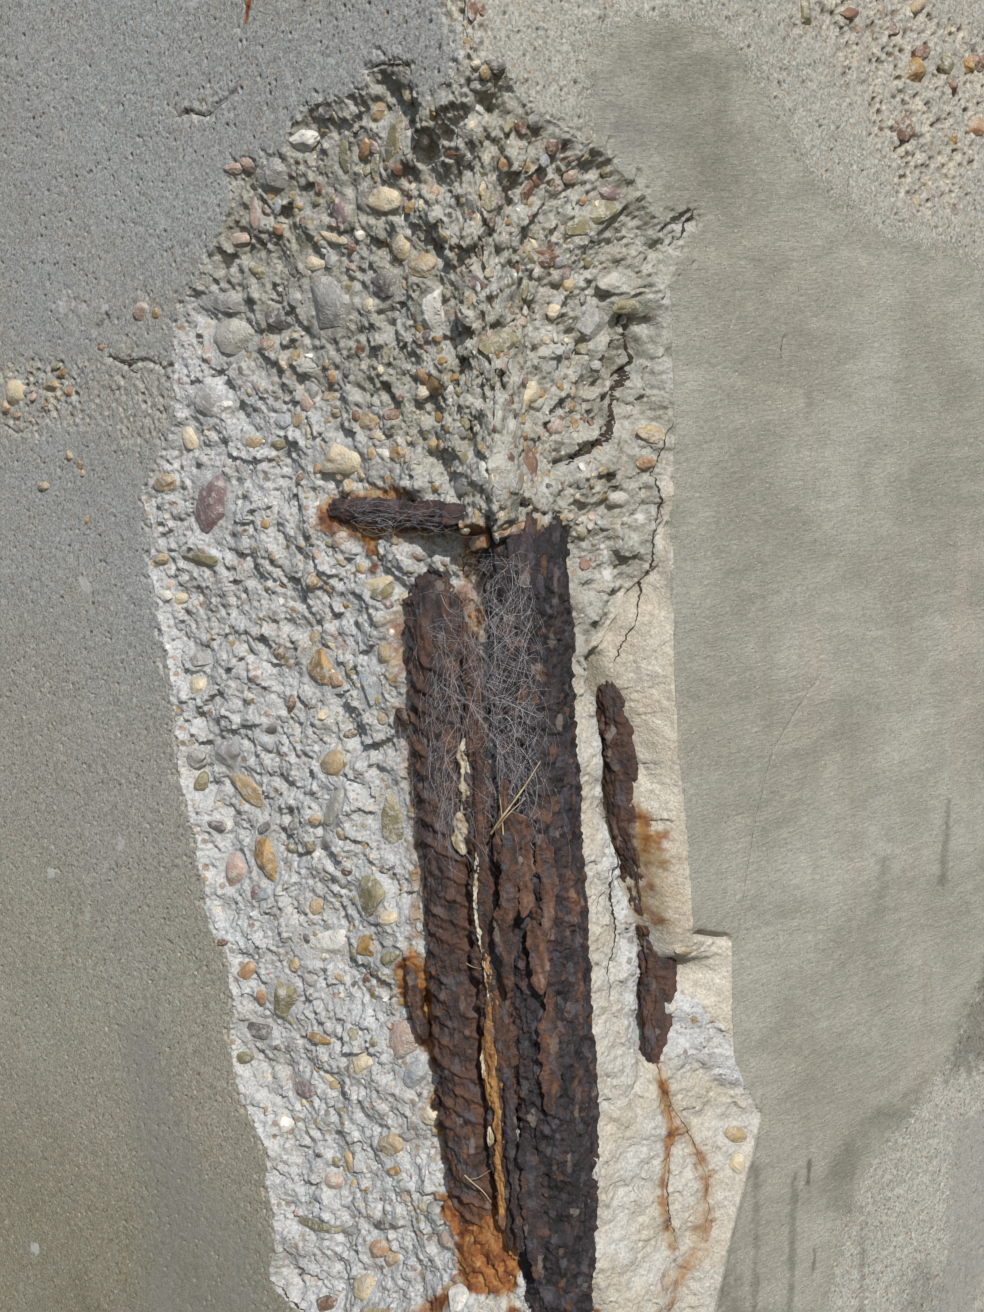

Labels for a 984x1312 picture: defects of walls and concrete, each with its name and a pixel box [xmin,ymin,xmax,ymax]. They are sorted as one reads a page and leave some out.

corrosion [316,498,427,571]
corrosion [350,486,415,501]
spalling [141,0,761,1312]
corrosion [395,707,419,842]
corrosion [394,948,447,1161]
corrosion [413,522,563,1312]
corrosion [578,794,600,1219]
corrosion [635,804,667,864]